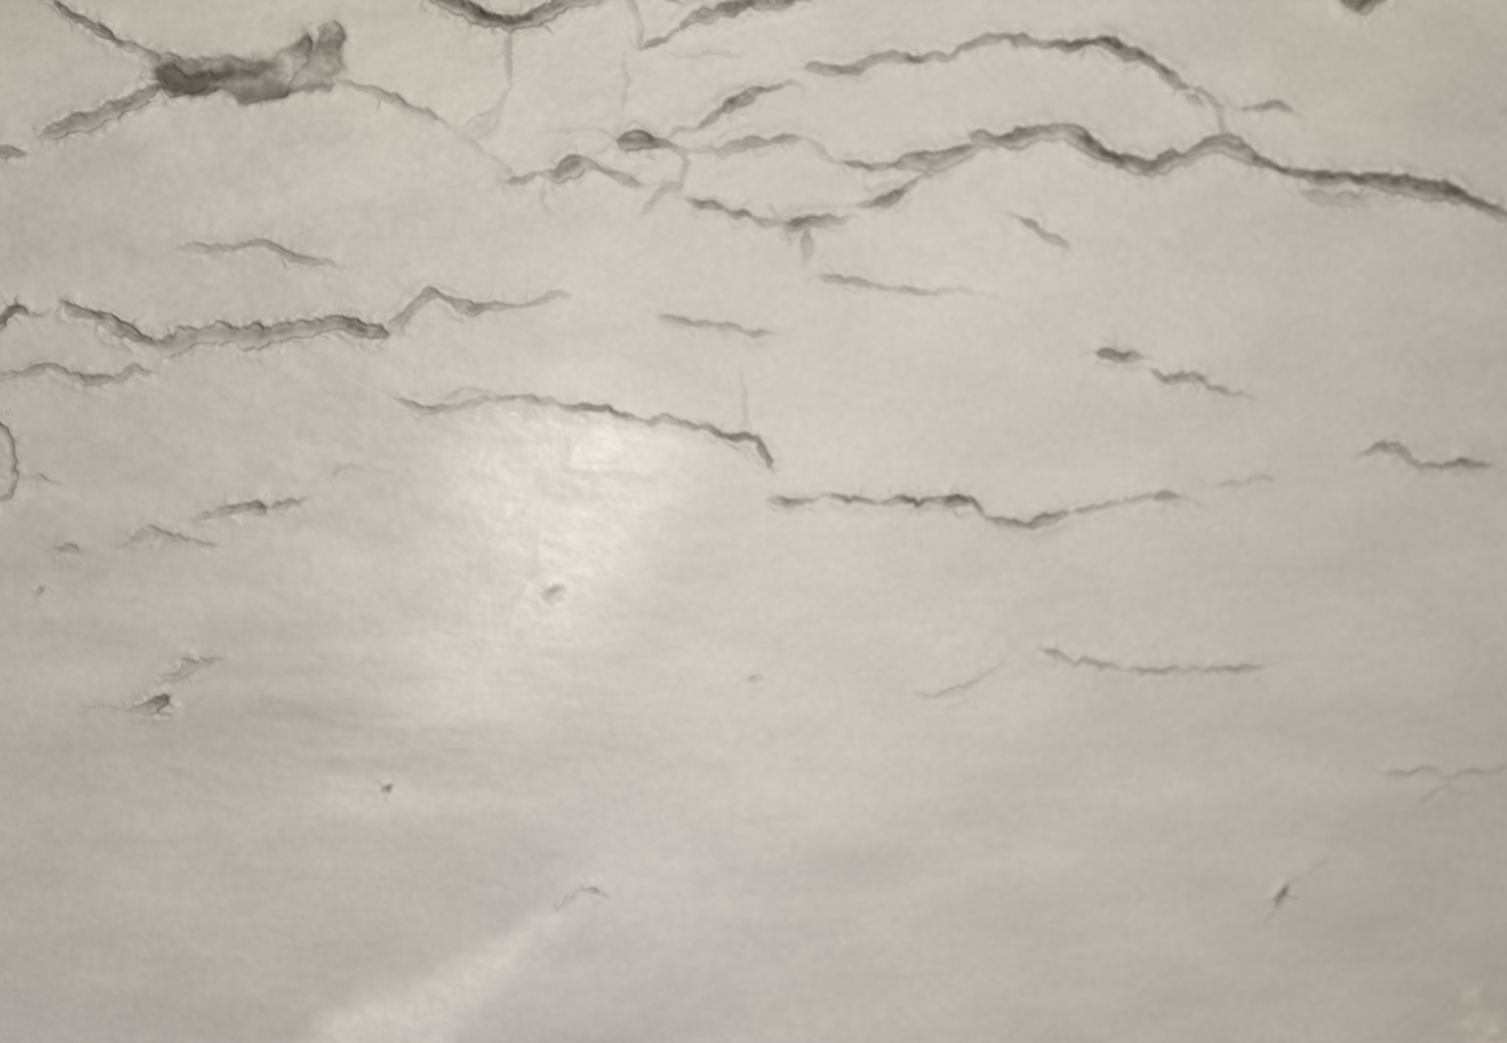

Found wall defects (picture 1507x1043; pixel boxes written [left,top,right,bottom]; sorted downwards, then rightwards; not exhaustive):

crack [0,0,1507,537]
crack [22,458,372,562]
crack [897,639,1294,706]